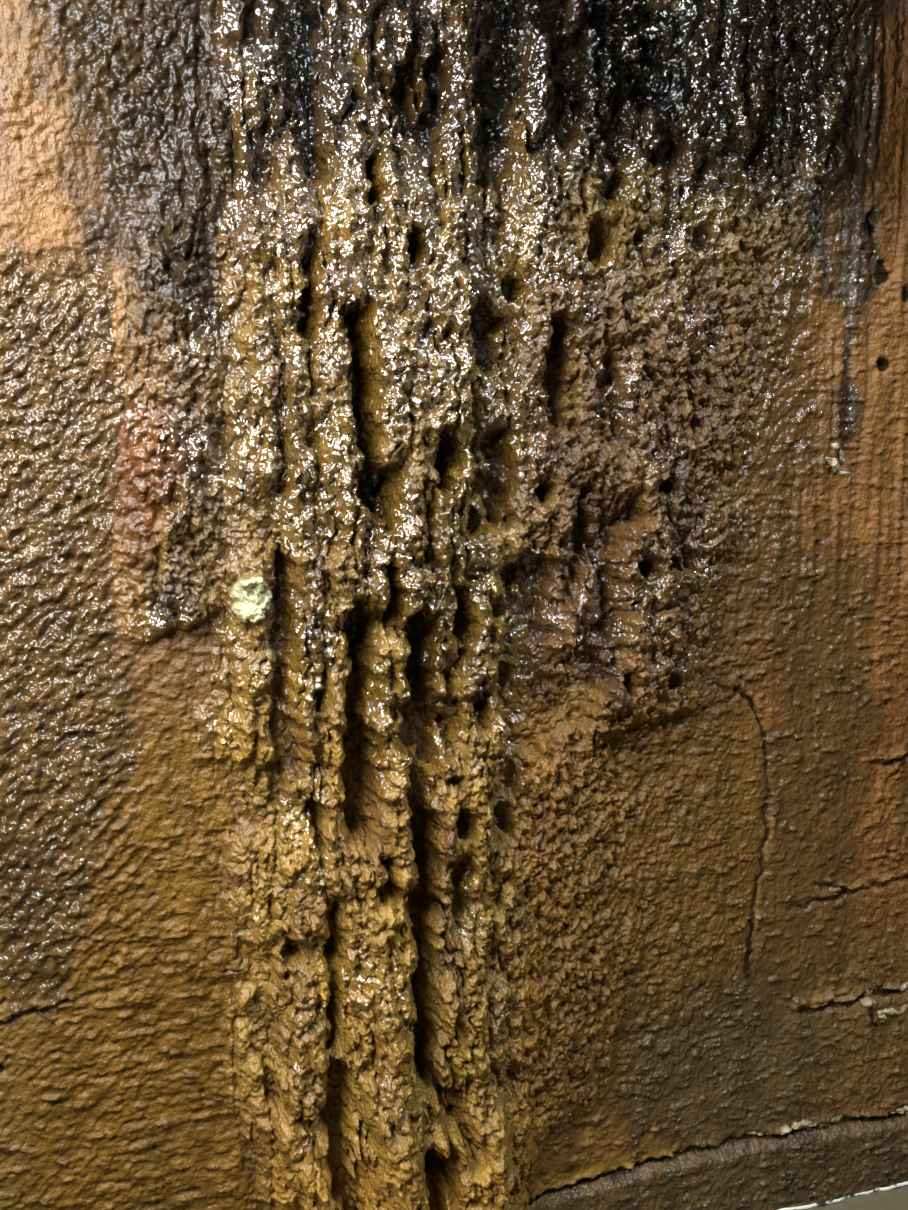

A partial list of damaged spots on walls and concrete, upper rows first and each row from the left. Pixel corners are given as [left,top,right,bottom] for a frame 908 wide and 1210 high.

damp [567,0,623,138]
damp [631,10,687,146]
damp [802,178,833,292]
damp [836,4,878,348]
damp [825,443,851,475]
damp [835,351,860,447]
damp [0,233,136,1019]
crack [709,681,779,978]
damp [752,536,880,997]
crack [797,869,908,910]
crack [807,981,908,1026]
crack [534,1106,904,1202]